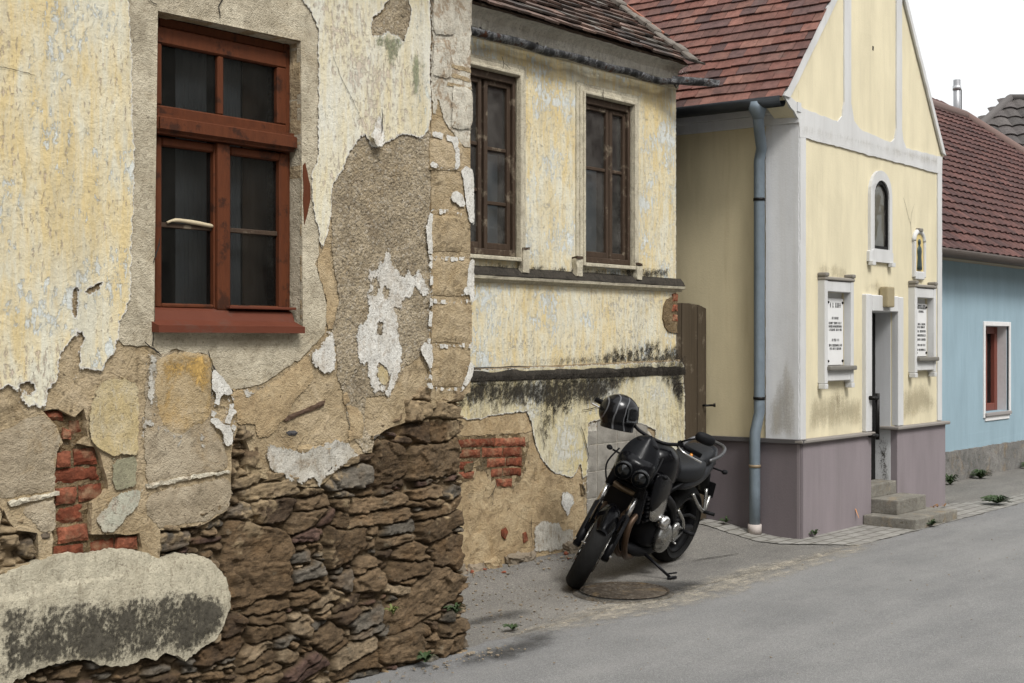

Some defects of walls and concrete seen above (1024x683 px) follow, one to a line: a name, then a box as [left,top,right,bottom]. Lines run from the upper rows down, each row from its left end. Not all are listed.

spalling [371,0,411,40]
spalling [265,116,475,487]
spalling [662,293,678,333]
water stain [459,340,686,439]
flaking render [43,378,182,554]
spalling [456,412,585,569]
water stain [1,591,225,680]